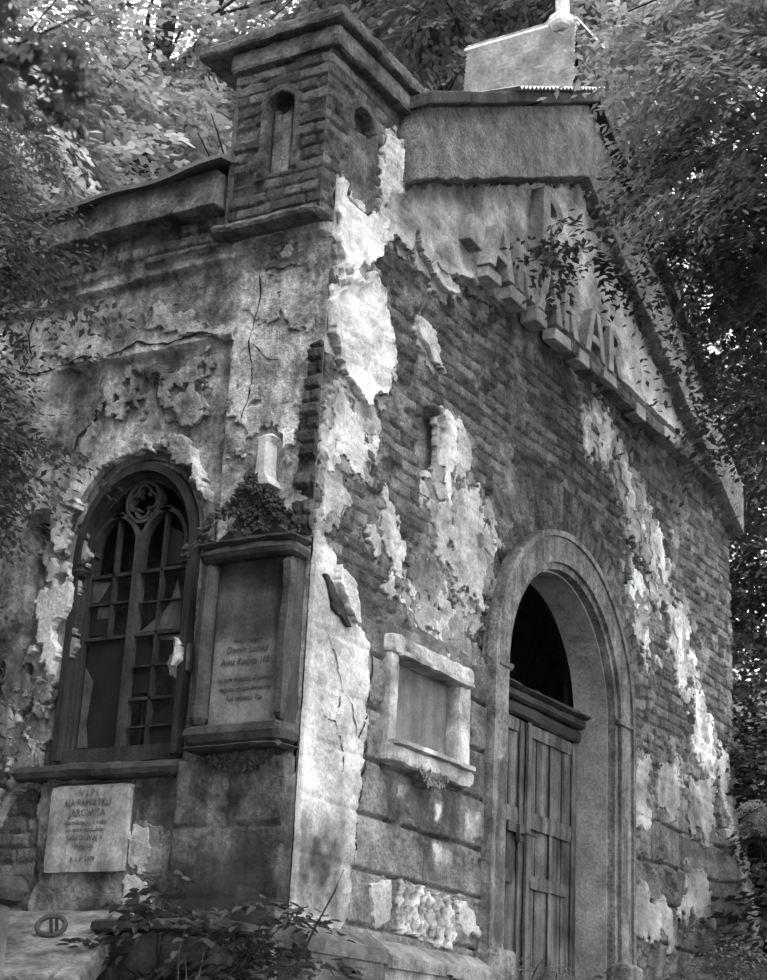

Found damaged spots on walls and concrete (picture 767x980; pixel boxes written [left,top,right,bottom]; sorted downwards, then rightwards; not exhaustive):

peeling [42,346,107,364]
crack [15,314,218,376]
peeling [92,300,237,503]
crack [241,261,279,418]
peeling [223,126,697,930]
peeling [0,489,94,911]
peeling [167,635,194,678]
crack [323,631,374,878]
peeling [568,367,764,969]
peeling [121,815,164,906]